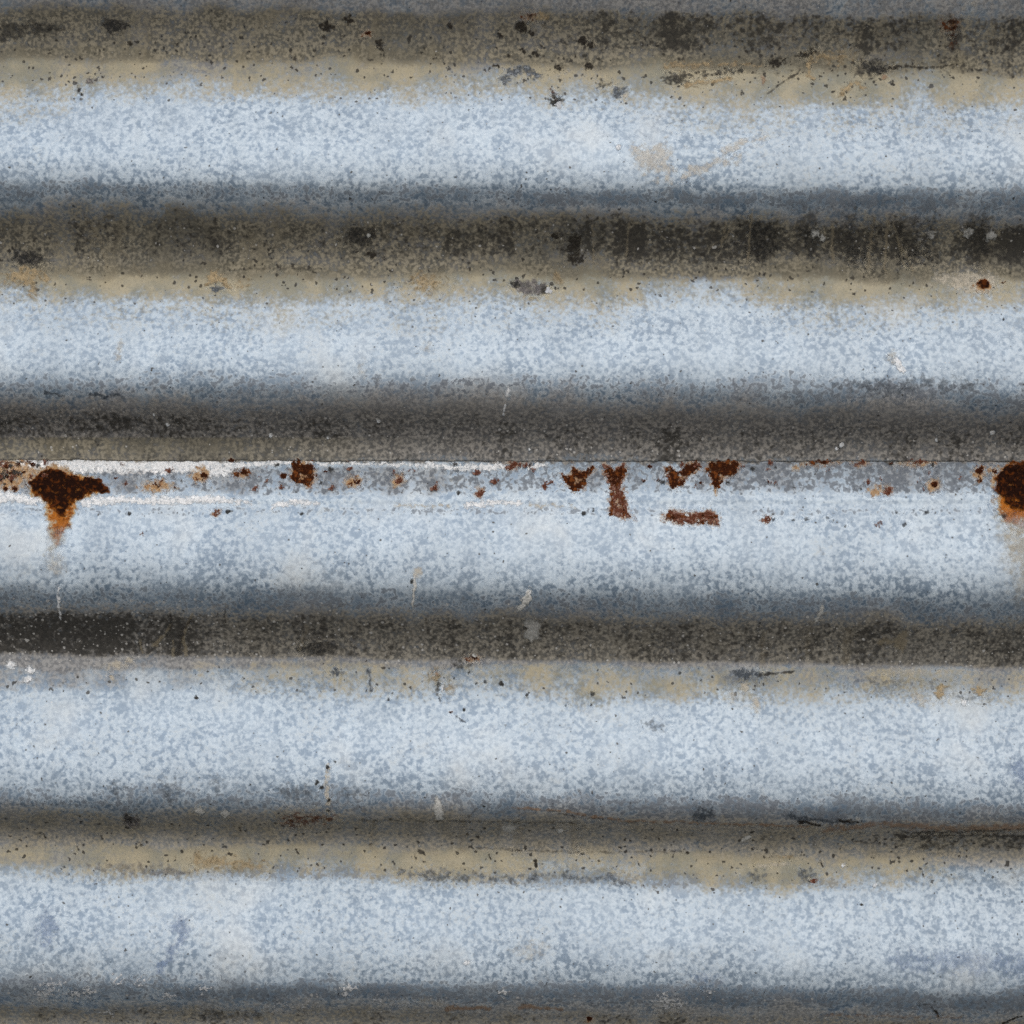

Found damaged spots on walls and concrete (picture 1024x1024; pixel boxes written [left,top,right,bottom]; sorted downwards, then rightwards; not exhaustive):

corrosion [0,458,637,538]
corrosion [661,509,719,526]
corrosion [641,459,778,496]
corrosion [958,461,1024,551]